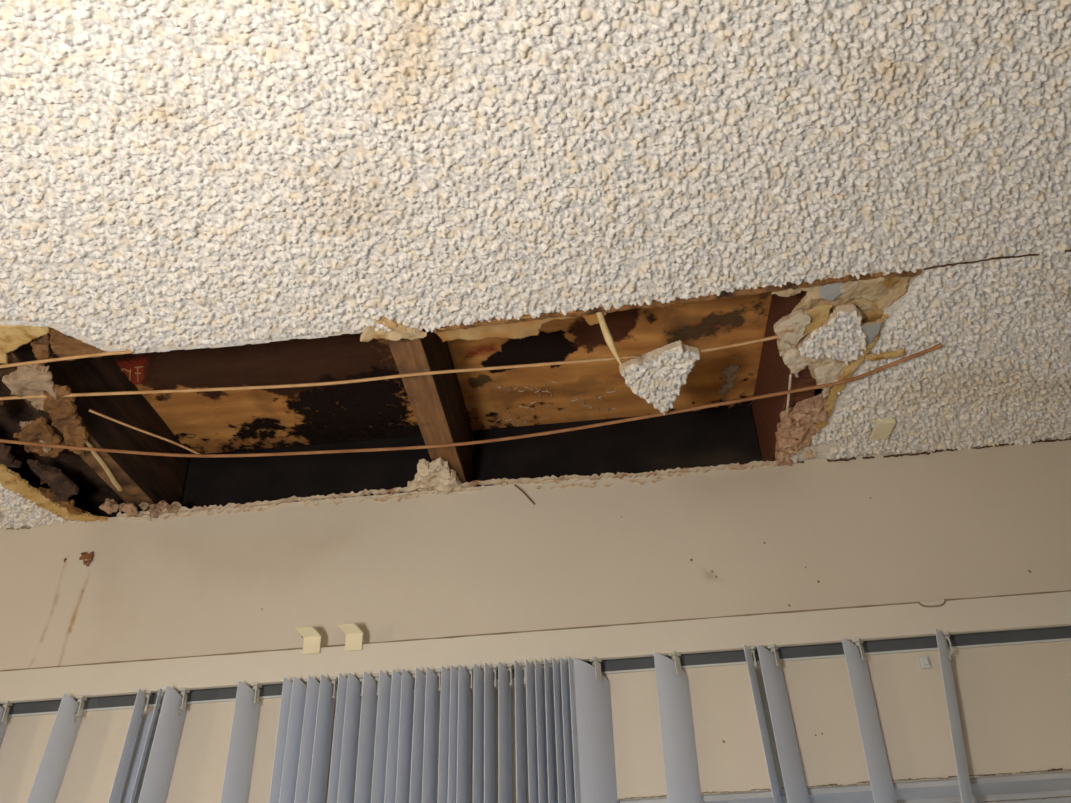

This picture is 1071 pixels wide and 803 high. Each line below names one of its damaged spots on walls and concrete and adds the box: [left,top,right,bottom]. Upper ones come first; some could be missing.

crack [924,250,1071,270]
damp [665,296,766,343]
flaking render [773,309,811,345]
damp [468,308,657,388]
damp [111,332,422,466]
damp [468,402,544,430]
damp [665,395,753,414]
flaking render [459,394,829,492]
spalling [117,487,440,521]